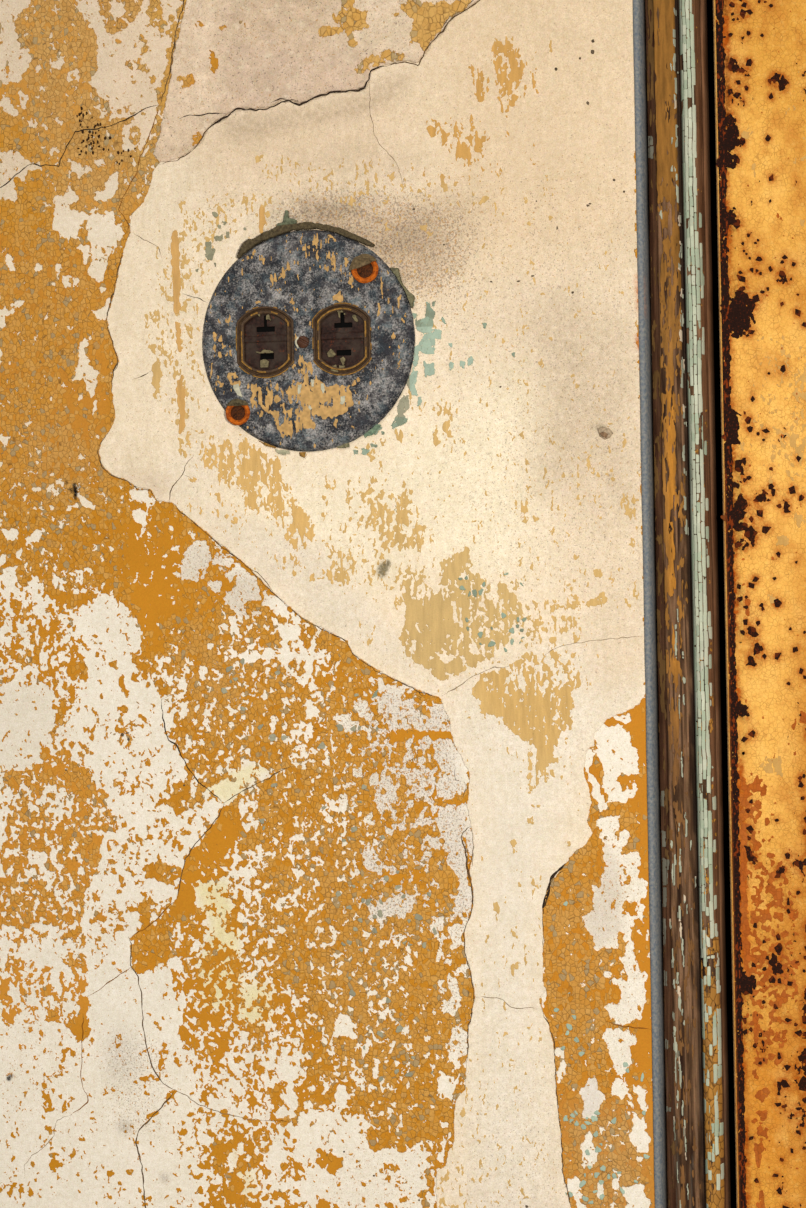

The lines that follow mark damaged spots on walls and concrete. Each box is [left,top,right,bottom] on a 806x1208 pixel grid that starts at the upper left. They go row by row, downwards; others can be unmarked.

crack [0,0,480,385]
crack [97,436,508,698]
peeling [0,0,643,1208]
peeling [613,0,725,1208]
rust [715,0,806,1208]
crack [24,694,289,1208]
crack [461,826,571,1206]
crack [606,1021,647,1029]